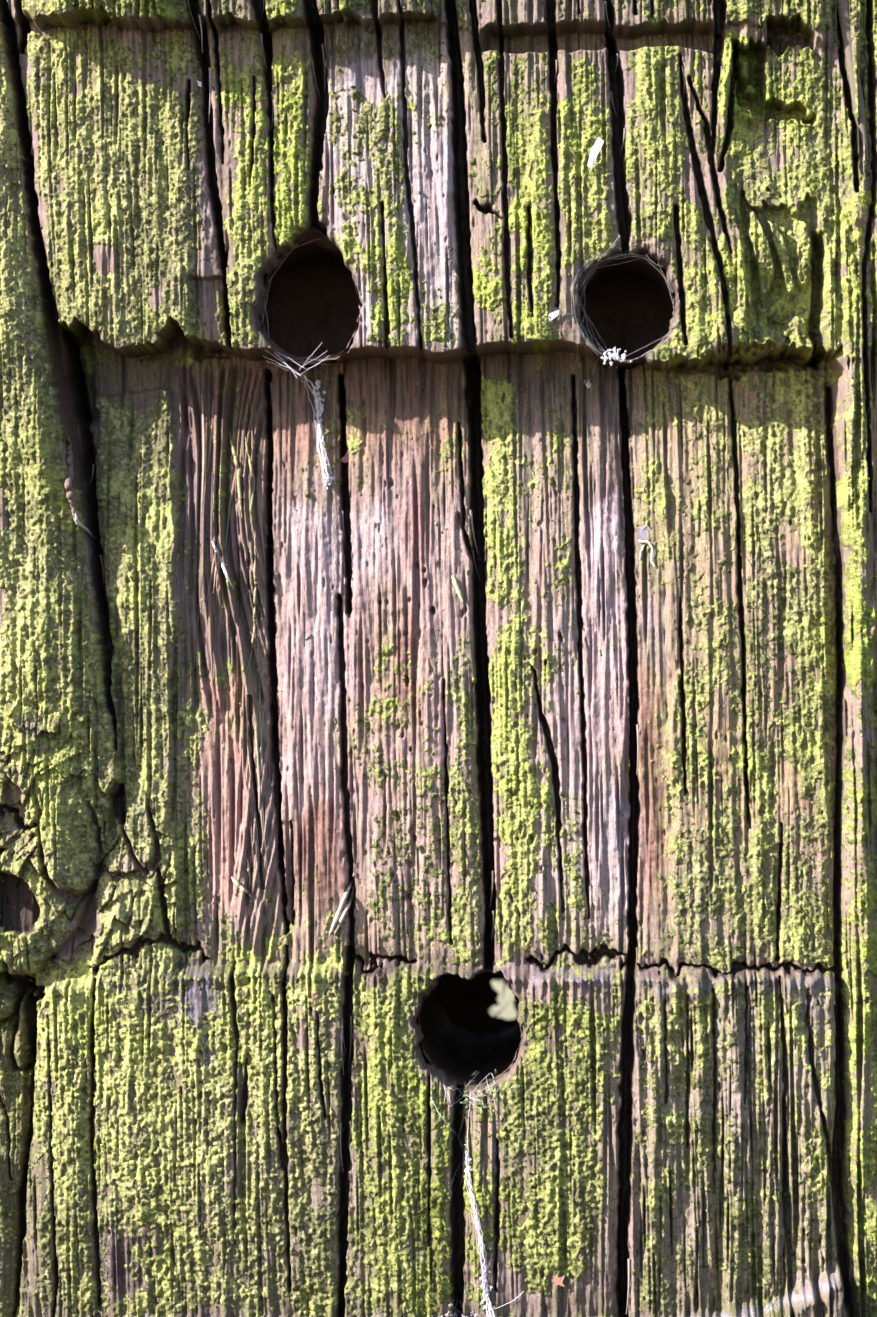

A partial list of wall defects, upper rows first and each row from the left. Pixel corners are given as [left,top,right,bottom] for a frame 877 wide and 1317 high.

crack [0,0,118,752]
crack [442,0,654,973]
crack [526,0,877,1317]
crack [0,804,38,854]
crack [90,369,417,1317]
leakage [178,983,220,1063]
leakage [532,967,612,987]
leakage [636,977,831,1098]
crack [0,970,60,1317]
leakage [100,1237,154,1292]
leakage [718,1280,835,1317]